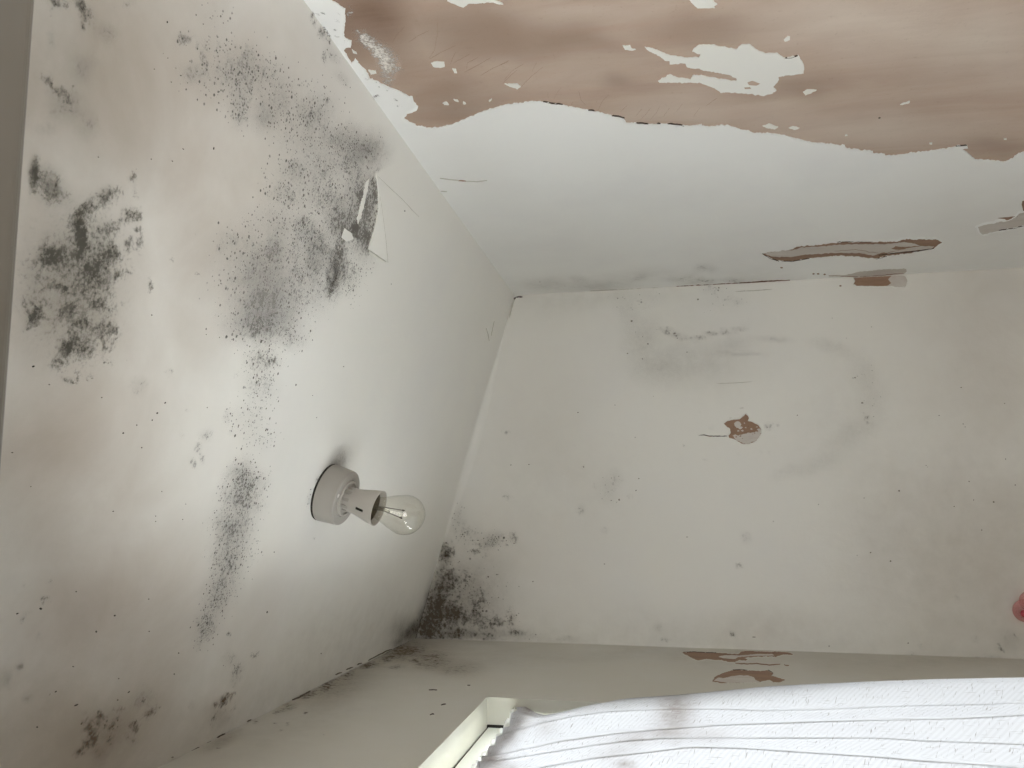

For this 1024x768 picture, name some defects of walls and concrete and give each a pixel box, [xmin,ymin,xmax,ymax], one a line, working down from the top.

peeling [330,0,1024,164]
leakage [30,158,62,201]
peeling [975,201,1024,236]
leakage [22,189,142,366]
peeling [759,237,944,289]
leakage [177,36,383,645]
flaking render [723,413,762,445]
leakage [364,531,517,671]
peeling [681,650,794,684]